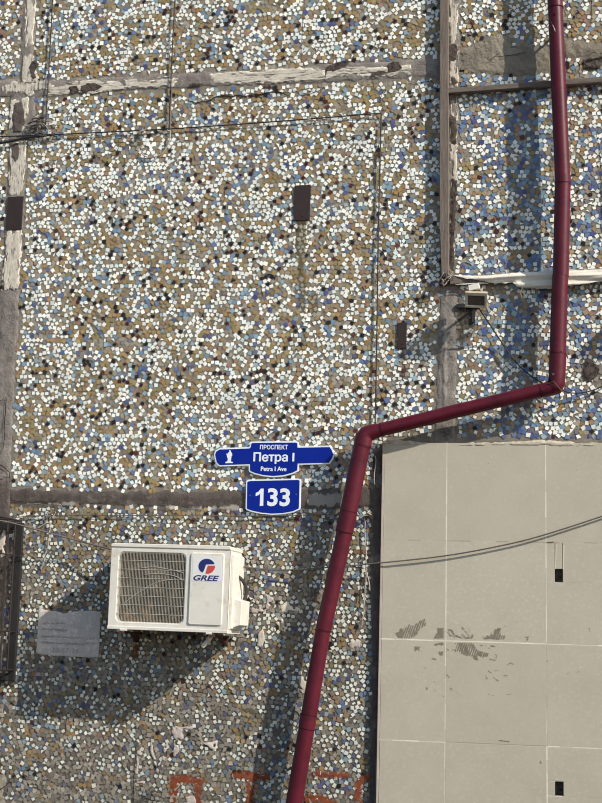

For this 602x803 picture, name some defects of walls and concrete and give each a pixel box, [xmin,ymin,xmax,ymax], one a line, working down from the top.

spalling [583,57,602,69]
peeling [189,60,411,87]
crack [186,86,327,104]